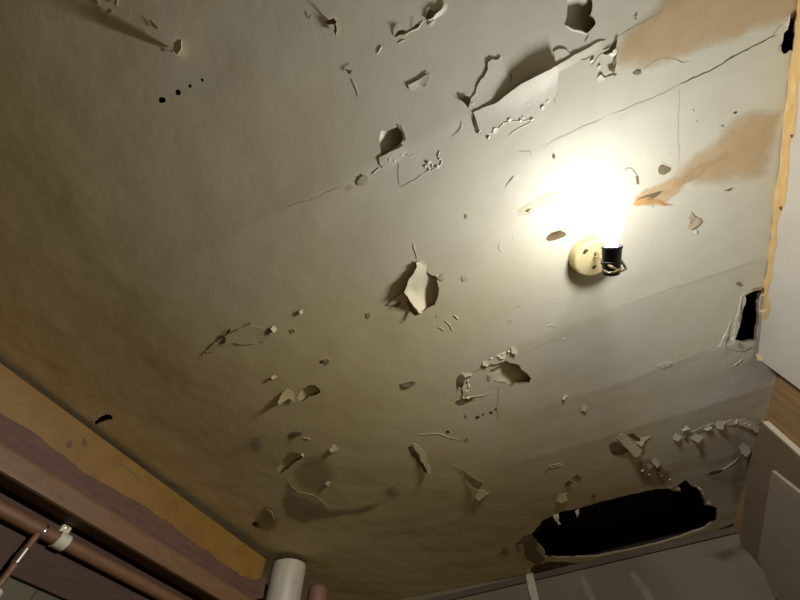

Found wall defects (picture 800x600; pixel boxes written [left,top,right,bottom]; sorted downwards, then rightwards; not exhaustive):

peeling [394,4,447,44]
damp [621,0,798,60]
peeling [457,0,617,140]
crack [519,24,783,159]
flaking render [372,125,414,174]
damp [637,117,774,205]
peeling [736,0,800,340]
peeling [387,243,446,316]
flaking render [456,345,530,405]
peeling [609,433,650,458]
peeling [673,419,759,443]
spalling [531,457,715,556]